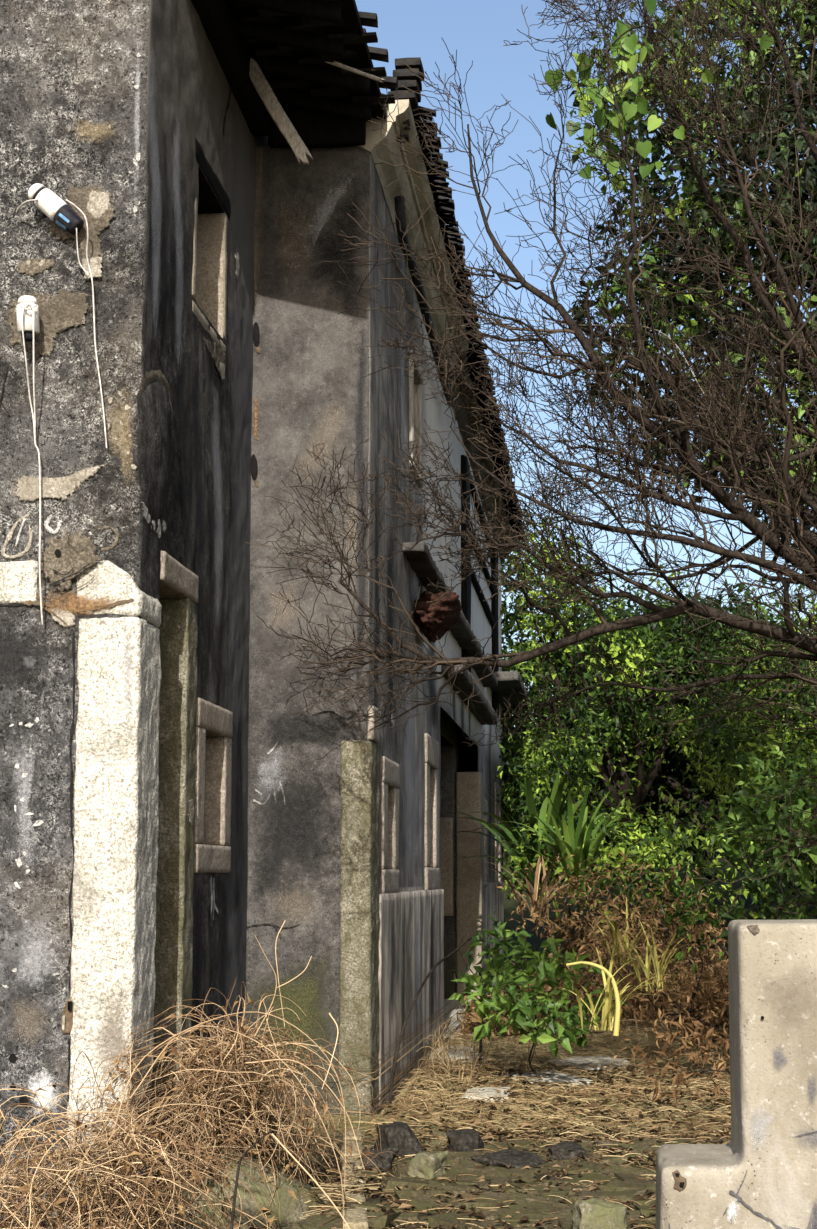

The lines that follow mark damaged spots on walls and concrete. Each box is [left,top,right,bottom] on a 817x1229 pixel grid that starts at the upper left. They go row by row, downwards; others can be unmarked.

peeling [4,183,116,362]
peeling [11,464,106,501]
rust [51,594,112,613]
crack [722,1170,782,1229]